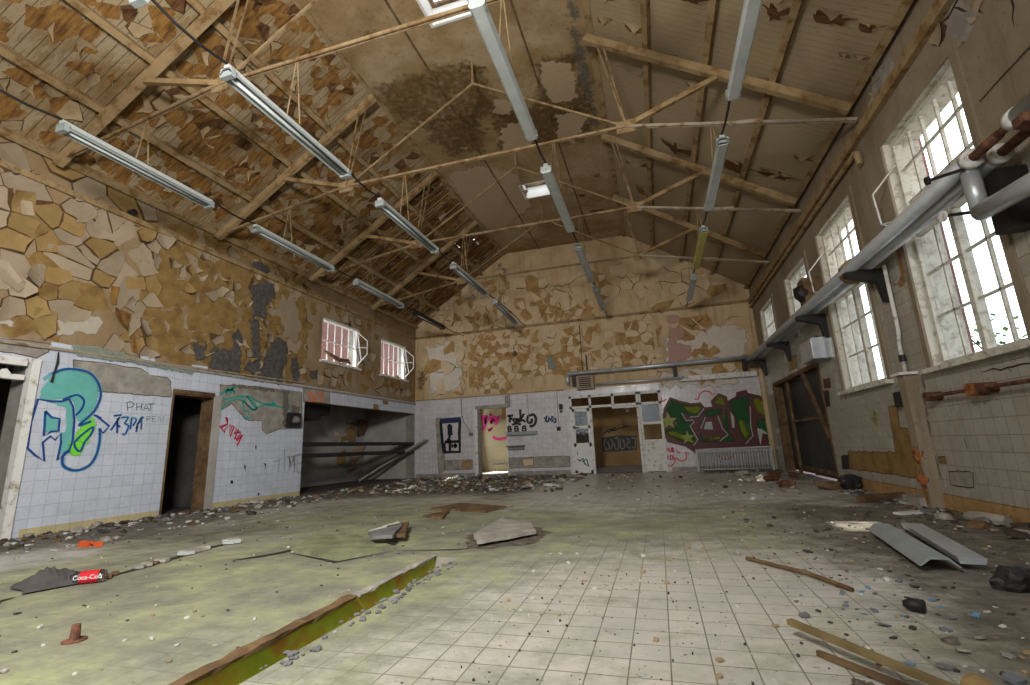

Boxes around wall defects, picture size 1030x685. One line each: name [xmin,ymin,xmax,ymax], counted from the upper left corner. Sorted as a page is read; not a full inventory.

peeling [762,0,790,22]
peeling [812,8,888,34]
crack [940,0,983,27]
water stain [375,2,599,155]
peeling [838,52,895,107]
peeling [724,158,803,182]
peeling [0,0,753,434]
water stain [72,261,318,427]
peeling [841,405,918,478]